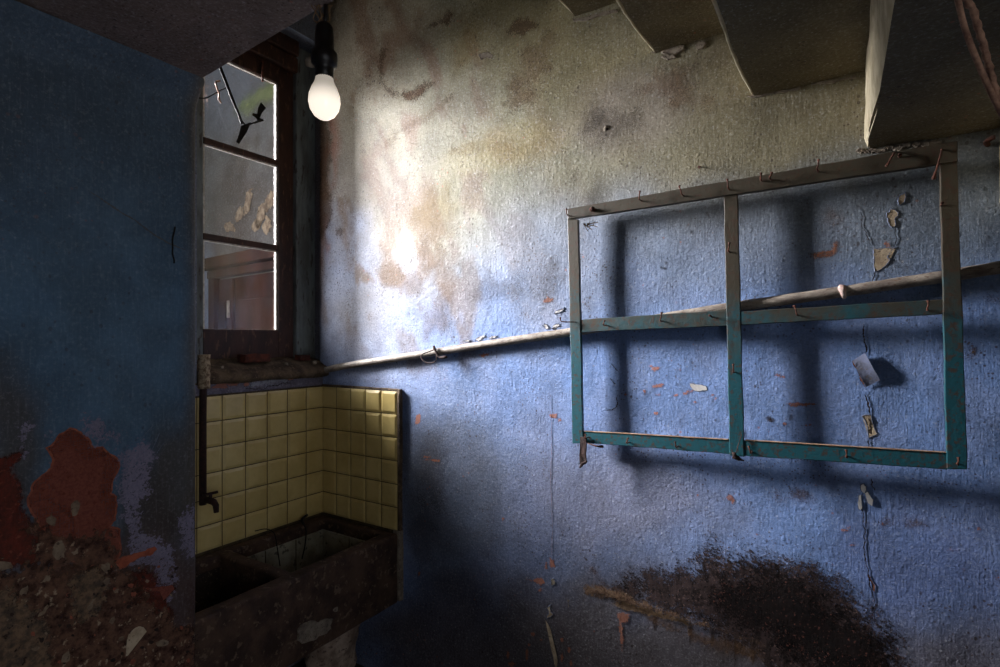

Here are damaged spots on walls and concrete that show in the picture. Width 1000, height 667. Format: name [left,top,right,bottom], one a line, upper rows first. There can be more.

leakage [378,48,431,100]
peeling [674,383,717,403]
crack [852,326,880,447]
spalling [0,411,198,667]
leakage [590,533,916,667]
crack [857,479,875,611]